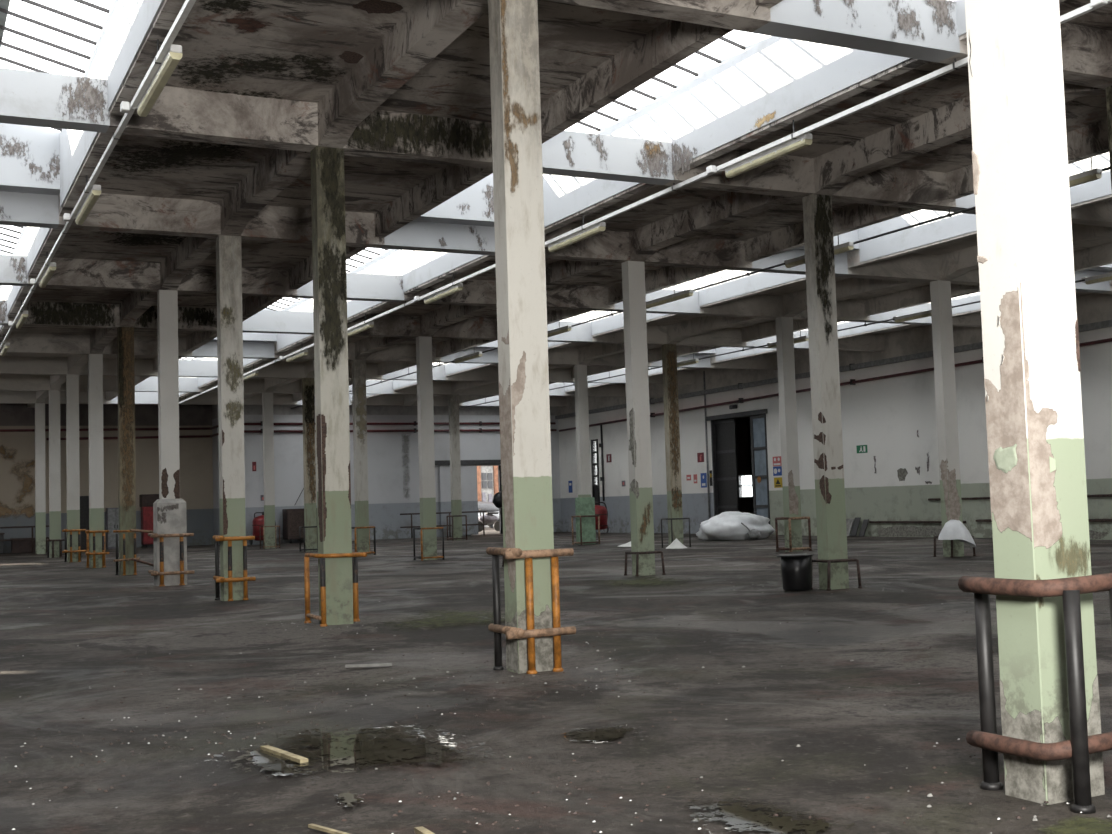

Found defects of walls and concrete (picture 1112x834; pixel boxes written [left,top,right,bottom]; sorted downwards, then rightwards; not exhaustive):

peeling [0,136,60,182]
water stain [316,111,492,370]
water stain [0,446,35,518]
water stain [356,385,367,442]
peeling [499,351,526,593]
peeling [814,412,843,504]
peeling [878,459,961,537]
peeling [984,283,1063,549]